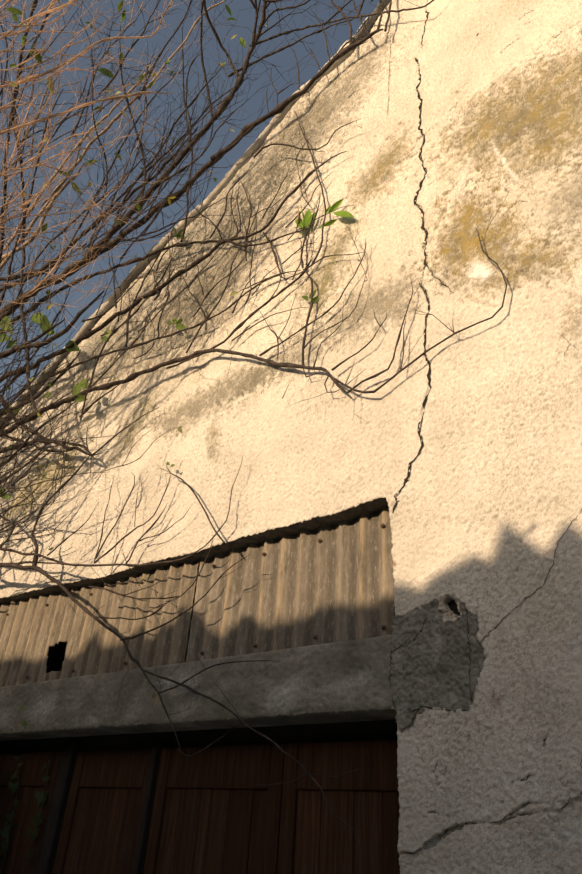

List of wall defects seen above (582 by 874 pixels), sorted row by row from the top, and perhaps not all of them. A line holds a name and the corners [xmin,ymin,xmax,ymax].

water stain [125,50,377,363]
crack [392,11,454,513]
water stain [467,256,493,282]
crack [478,511,581,644]
spalling [389,590,486,733]
crack [405,802,533,854]